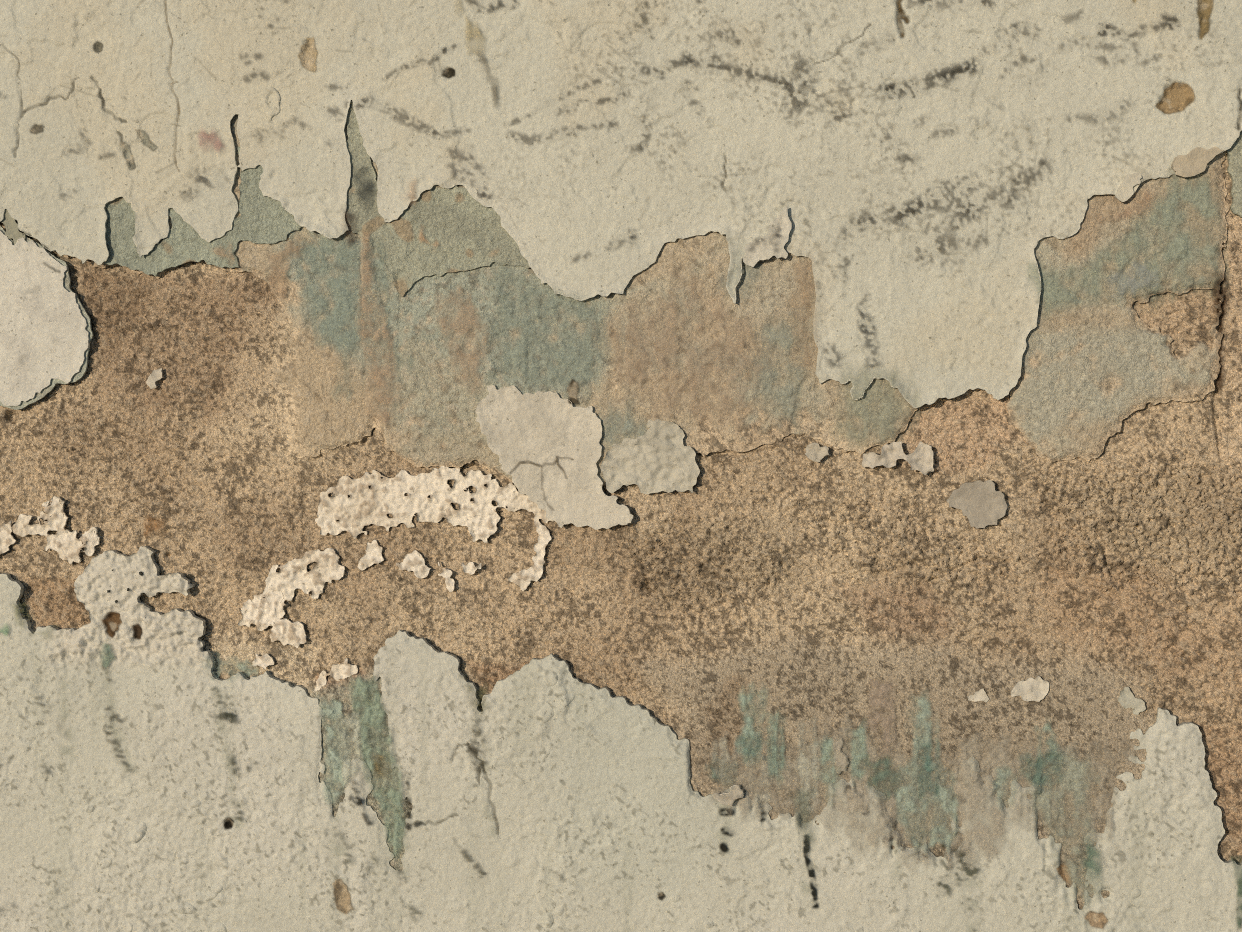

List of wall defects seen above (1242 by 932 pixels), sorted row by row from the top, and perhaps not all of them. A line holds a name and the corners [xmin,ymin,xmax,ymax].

crack [860,0,909,37]
spalling [1156,83,1194,114]
peeling [91,100,918,487]
peeling [1005,131,1242,462]
spalling [0,208,1242,914]
water stain [342,677,404,855]
water stain [712,681,935,846]
water stain [936,725,1113,866]
peeling [1085,912,1108,928]